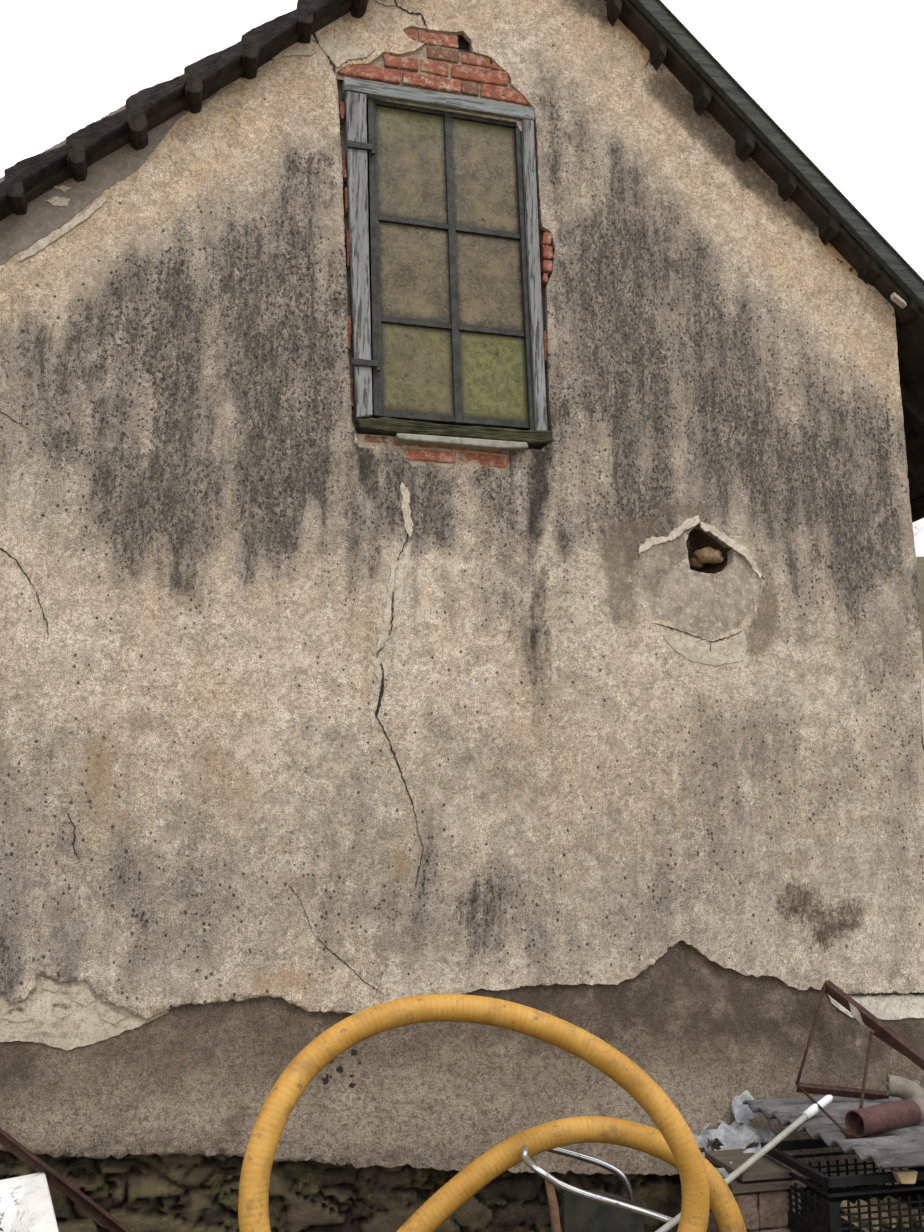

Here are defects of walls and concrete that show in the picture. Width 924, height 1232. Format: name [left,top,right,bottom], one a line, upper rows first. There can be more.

spalling [272,28,530,107]
peeling [19,185,107,262]
spalling [342,154,350,271]
spalling [539,232,553,288]
spalling [357,434,510,478]
water stain [516,447,553,543]
crack [0,548,49,635]
spalling [605,507,777,666]
crack [371,482,424,891]
flaking render [0,973,169,1050]
flaking render [826,991,924,1020]
spalling [322,1049,361,1088]